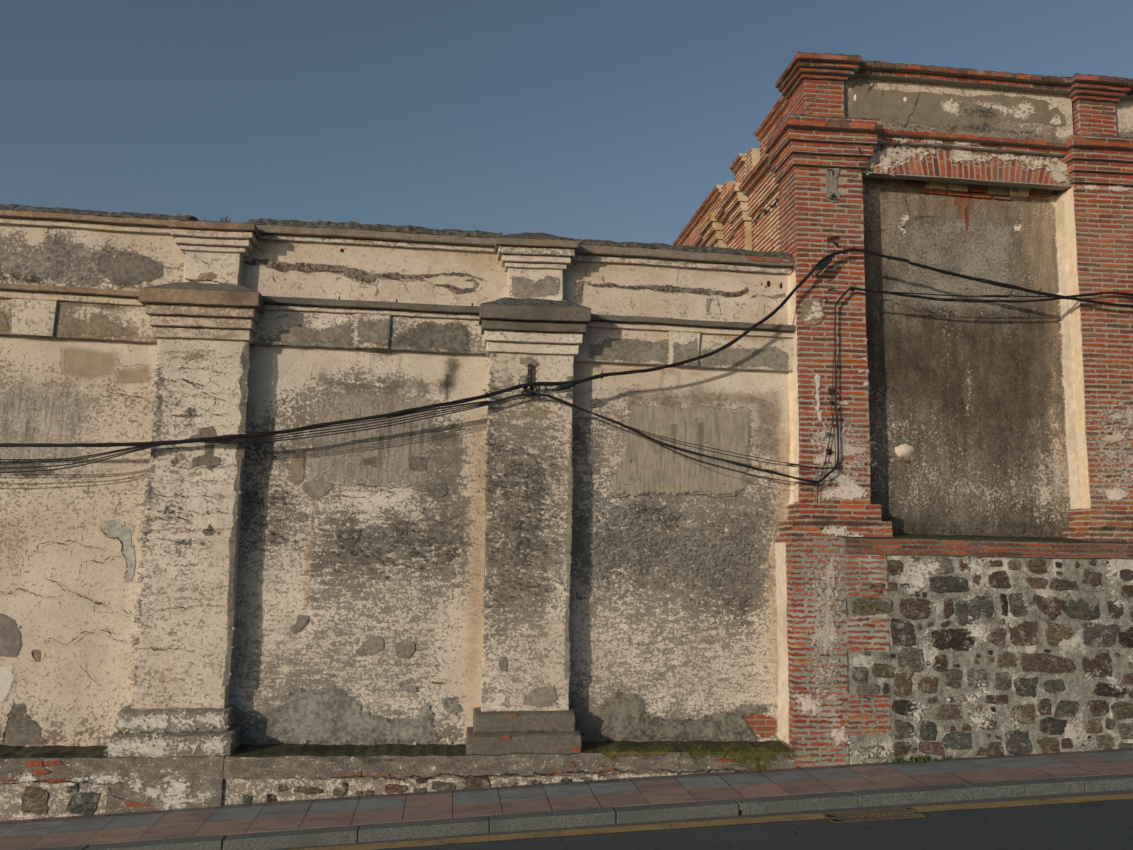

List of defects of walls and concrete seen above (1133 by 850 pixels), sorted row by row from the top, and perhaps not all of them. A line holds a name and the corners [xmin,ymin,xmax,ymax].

flaking render [847,80,1066,127]
flaking render [0,227,163,287]
crack [0,349,238,690]
peeling [99,341,250,686]
damp [240,352,896,632]
flaking render [0,614,21,657]
damp [793,551,894,764]